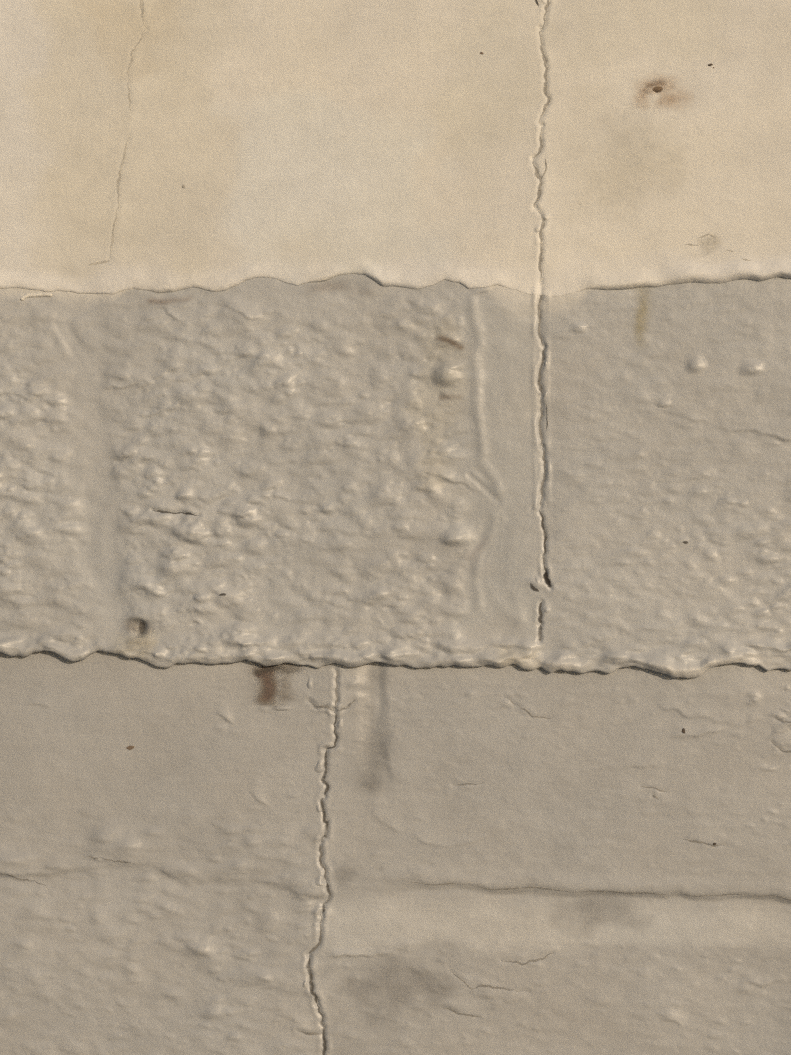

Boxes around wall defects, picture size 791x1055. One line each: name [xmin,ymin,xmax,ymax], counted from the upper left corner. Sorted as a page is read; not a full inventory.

crack [531,0,552,640]
crack [300,669,355,1055]